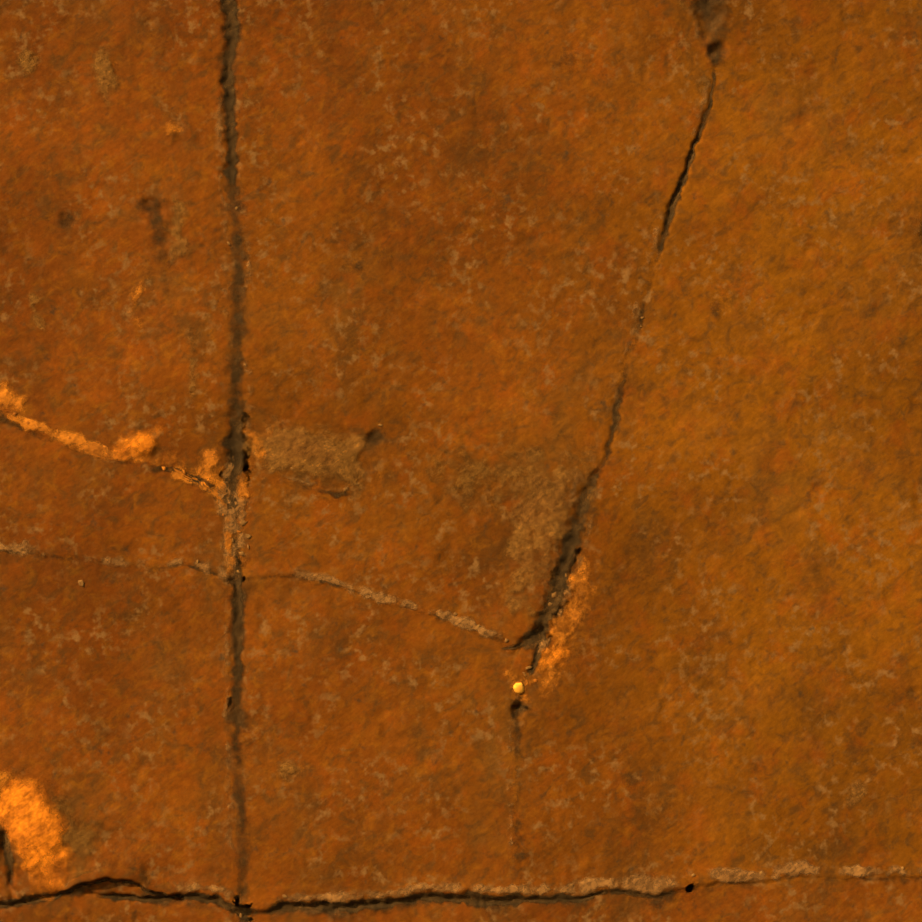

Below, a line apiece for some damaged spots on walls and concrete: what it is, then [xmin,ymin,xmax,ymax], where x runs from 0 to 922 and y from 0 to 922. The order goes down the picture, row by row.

crack [648,72,716,262]
crack [167,0,251,751]
crack [0,540,44,556]
crack [85,557,128,566]
crack [289,380,625,698]
rust [0,772,97,888]
crack [0,779,921,922]